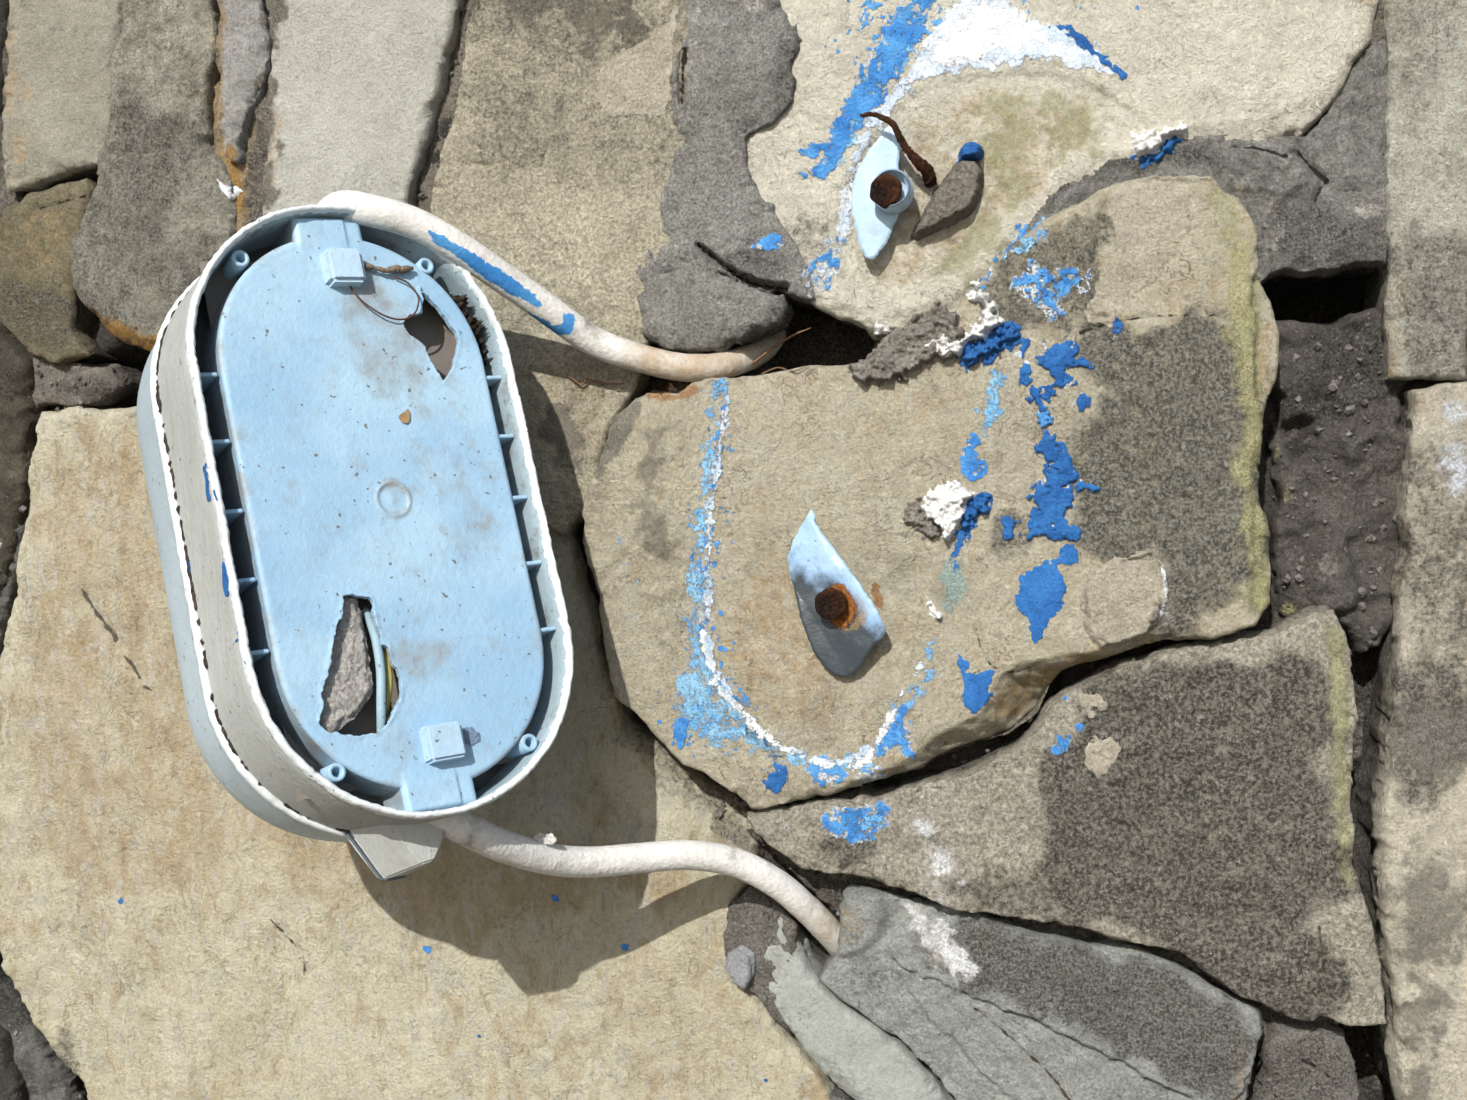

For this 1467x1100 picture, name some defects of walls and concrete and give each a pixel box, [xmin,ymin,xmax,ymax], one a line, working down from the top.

corrosion [224,144,243,210]
corrosion [90,310,157,351]
corrosion [831,583,883,629]